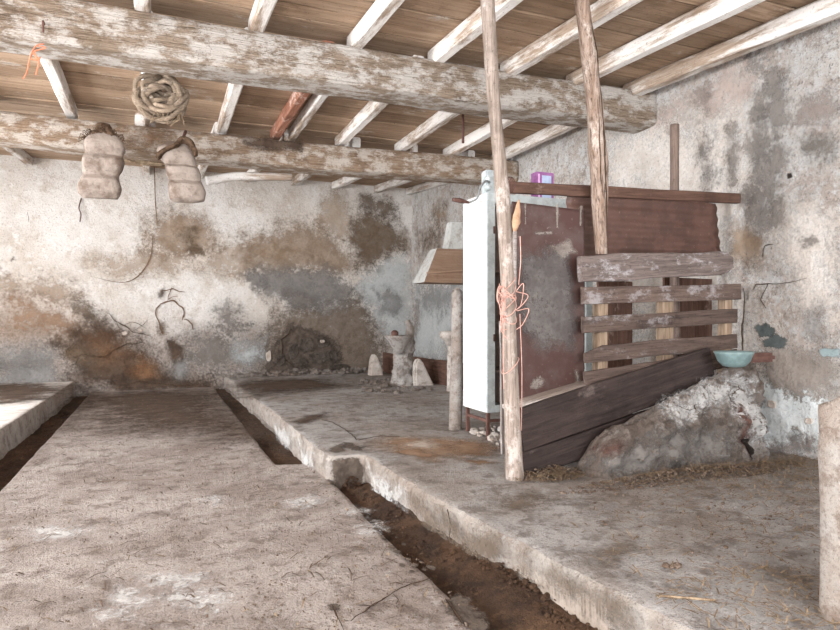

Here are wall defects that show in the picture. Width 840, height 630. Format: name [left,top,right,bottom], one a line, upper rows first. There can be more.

damp [656,52,791,265]
damp [94,189,448,290]
crack [72,288,193,387]
damp [0,289,402,444]
crack [741,278,806,351]